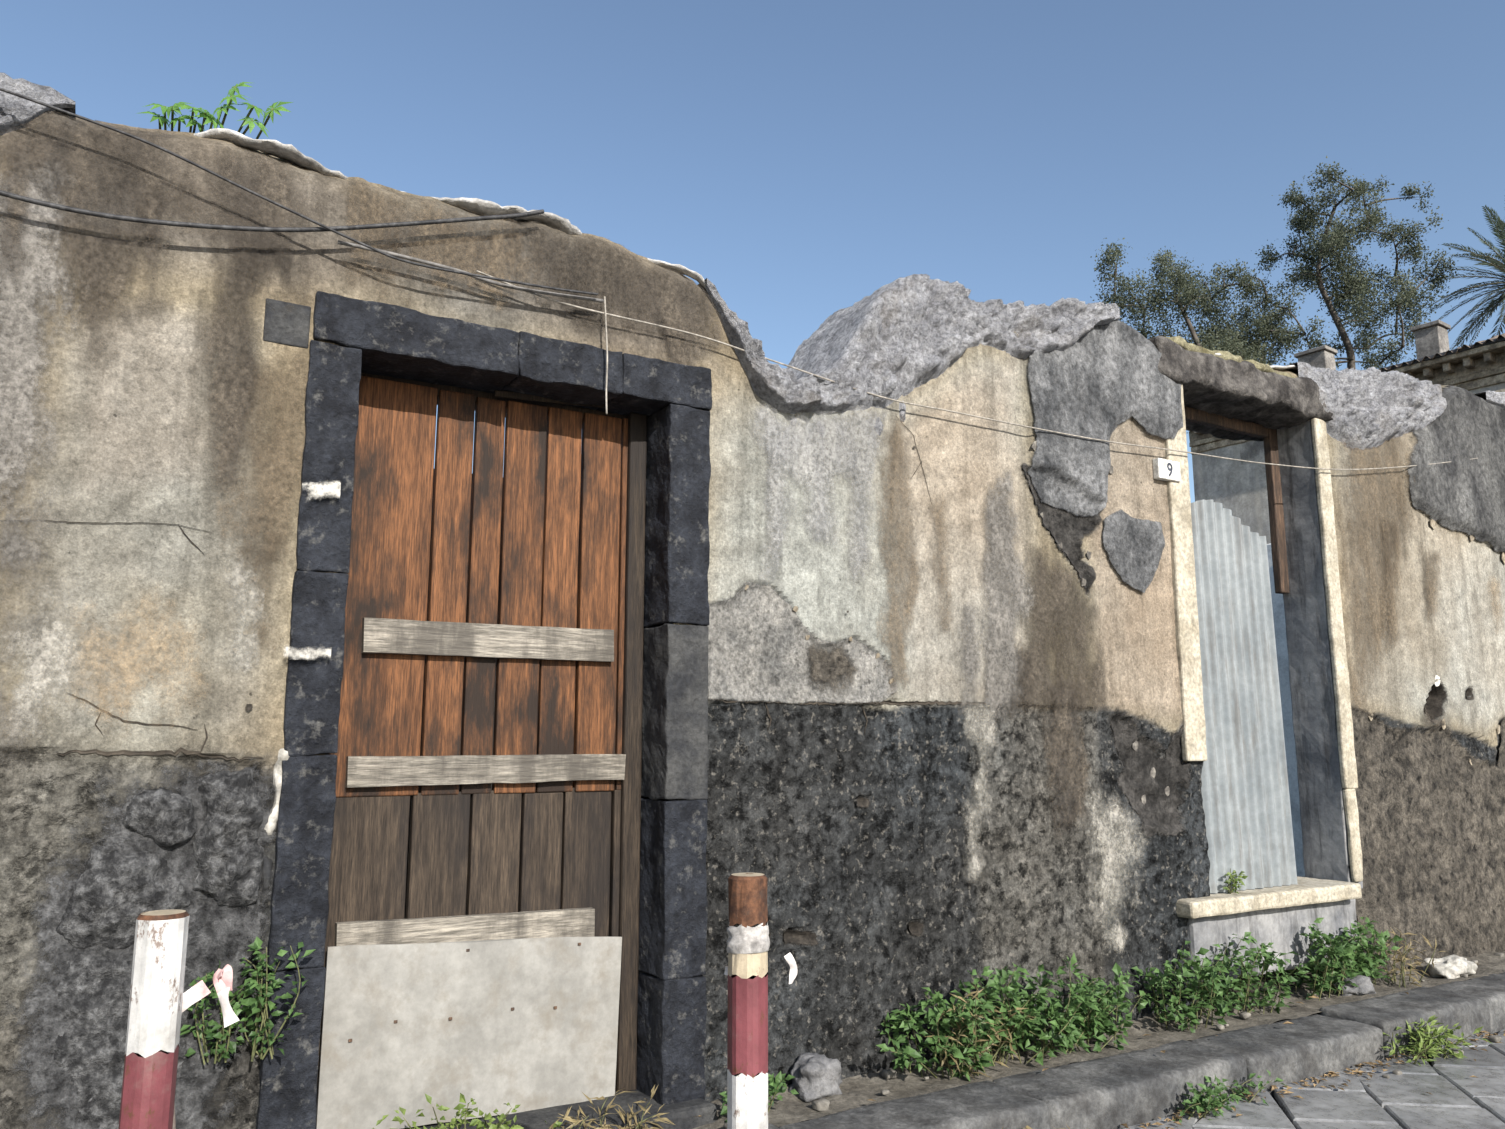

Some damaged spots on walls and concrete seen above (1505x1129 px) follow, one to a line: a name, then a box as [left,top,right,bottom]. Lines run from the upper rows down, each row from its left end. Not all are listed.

leakage [0,110,294,497]
crack [0,520,209,555]
leakage [250,390,305,551]
spalling [1022,441,1102,592]
peeling [1408,386,1505,564]
leakage [0,623,70,746]
peeling [708,582,897,704]
peeling [1351,705,1505,972]